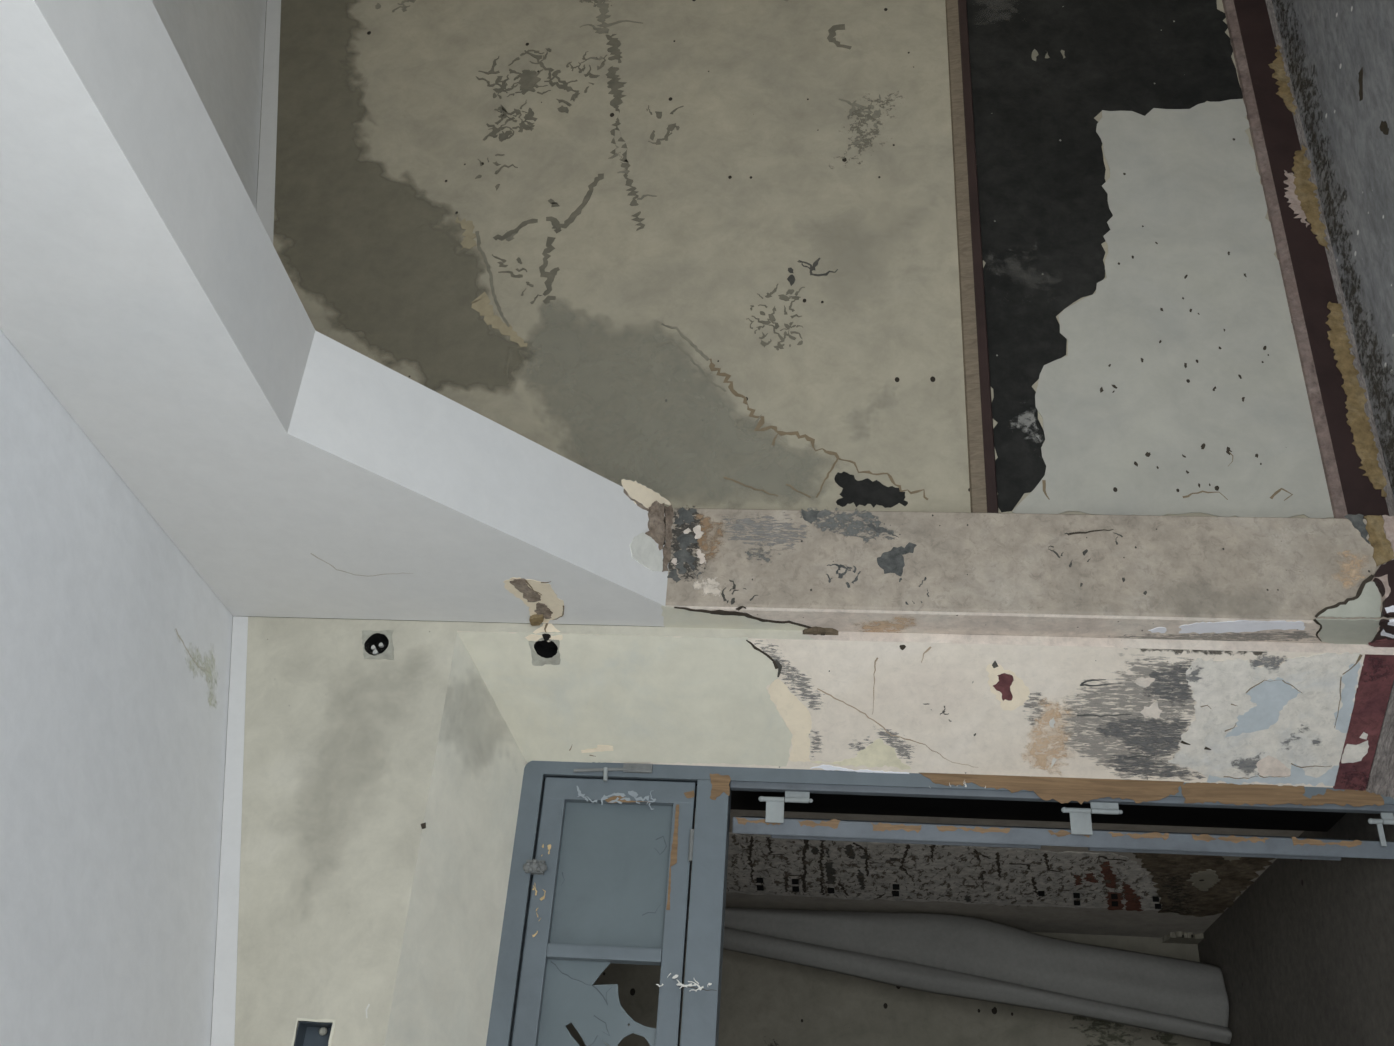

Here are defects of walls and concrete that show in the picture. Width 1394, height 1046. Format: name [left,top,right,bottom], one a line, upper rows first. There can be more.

damp [257,0,819,499]
crack [655,323,928,500]
peeling [455,0,1394,910]
damp [668,506,703,583]
crack [674,606,812,628]
flaking render [726,832,1275,944]